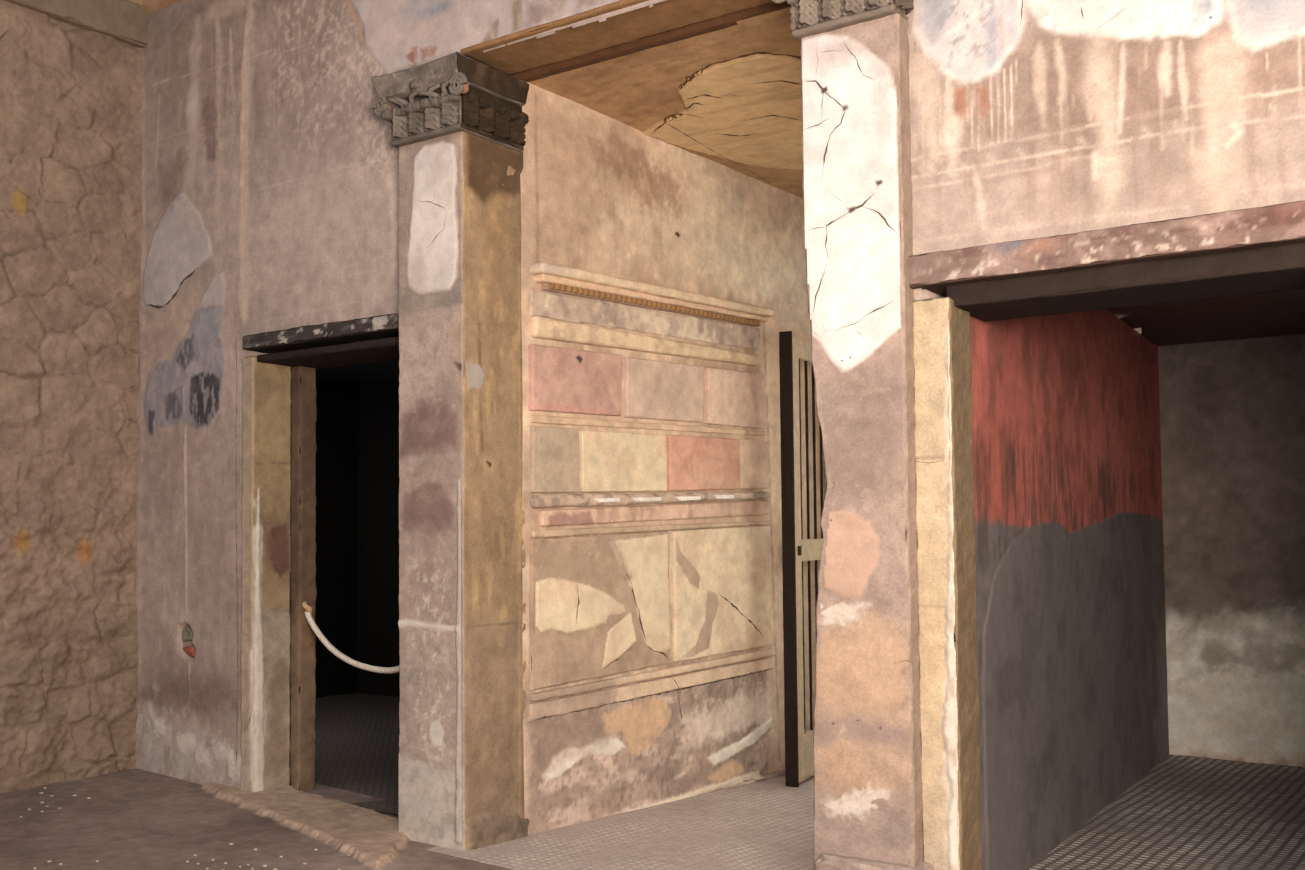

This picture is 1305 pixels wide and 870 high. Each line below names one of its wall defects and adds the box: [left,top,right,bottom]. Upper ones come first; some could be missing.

crack [804,38,894,337]
water stain [909,22,1138,233]
water stain [1153,12,1272,216]
water stain [1296,31,1305,92]
crack [536,567,765,720]